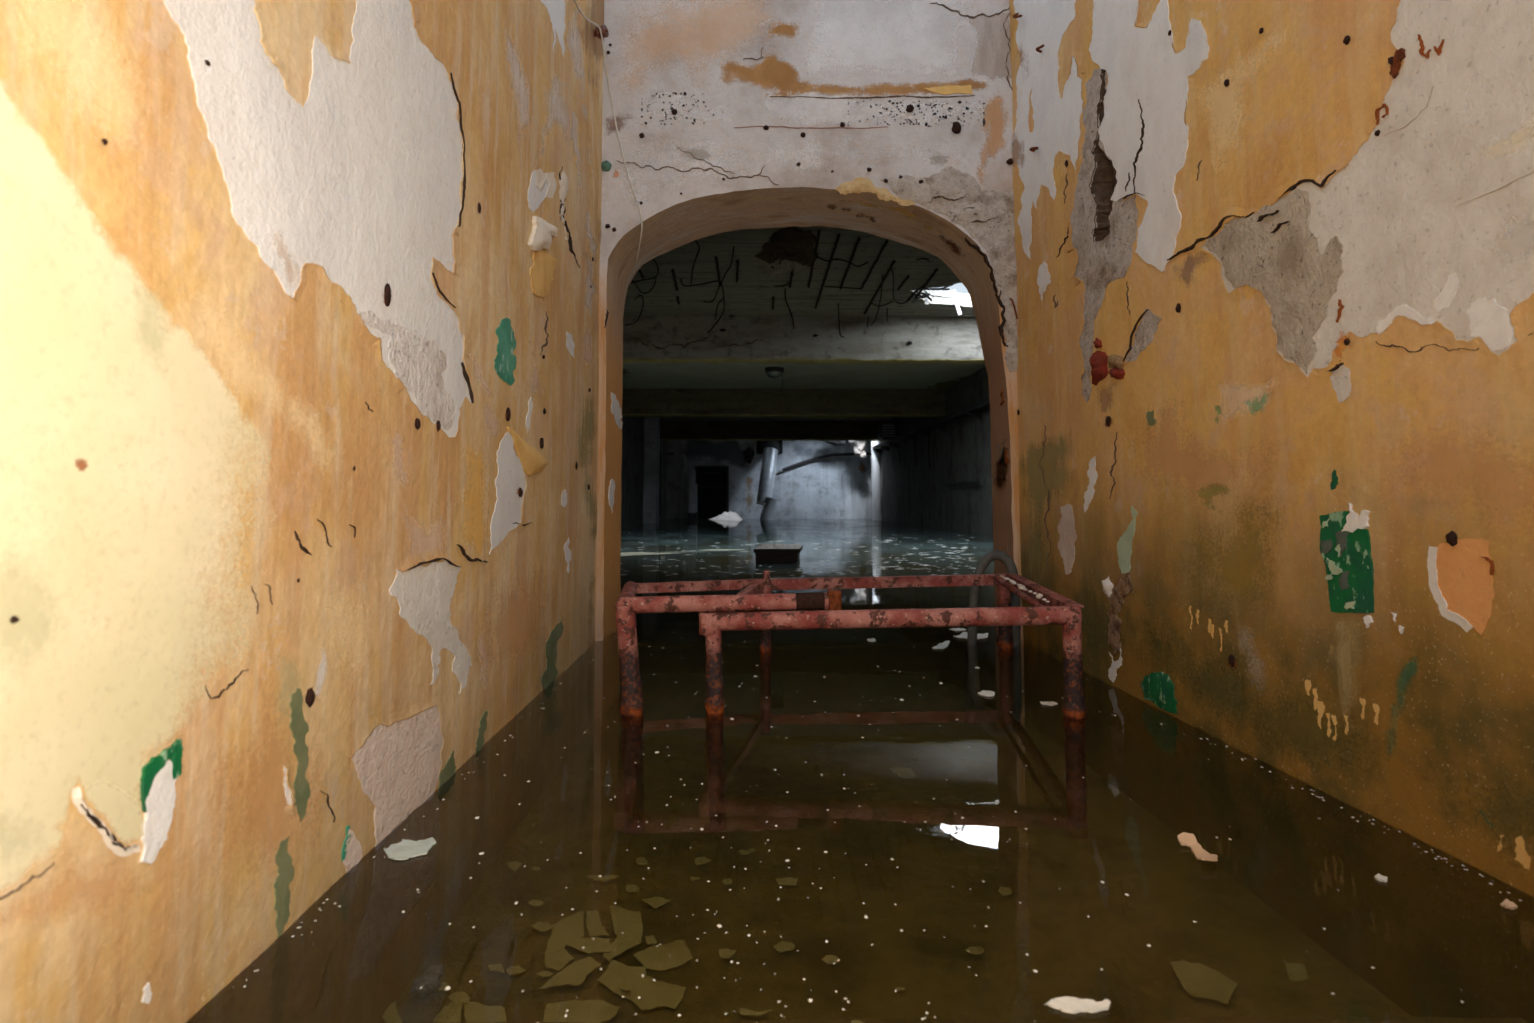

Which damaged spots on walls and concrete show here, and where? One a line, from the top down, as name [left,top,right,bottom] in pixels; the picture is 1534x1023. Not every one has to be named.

peeling [721,22,986,96]
crack [734,2,1013,129]
peeling [164,0,478,446]
peeling [506,0,581,297]
crack [617,147,778,185]
peeling [834,0,1534,423]
peeling [494,318,517,386]
peeling [489,397,547,555]
peeling [1427,539,1495,636]
peeling [341,550,472,873]
peeling [71,739,183,864]